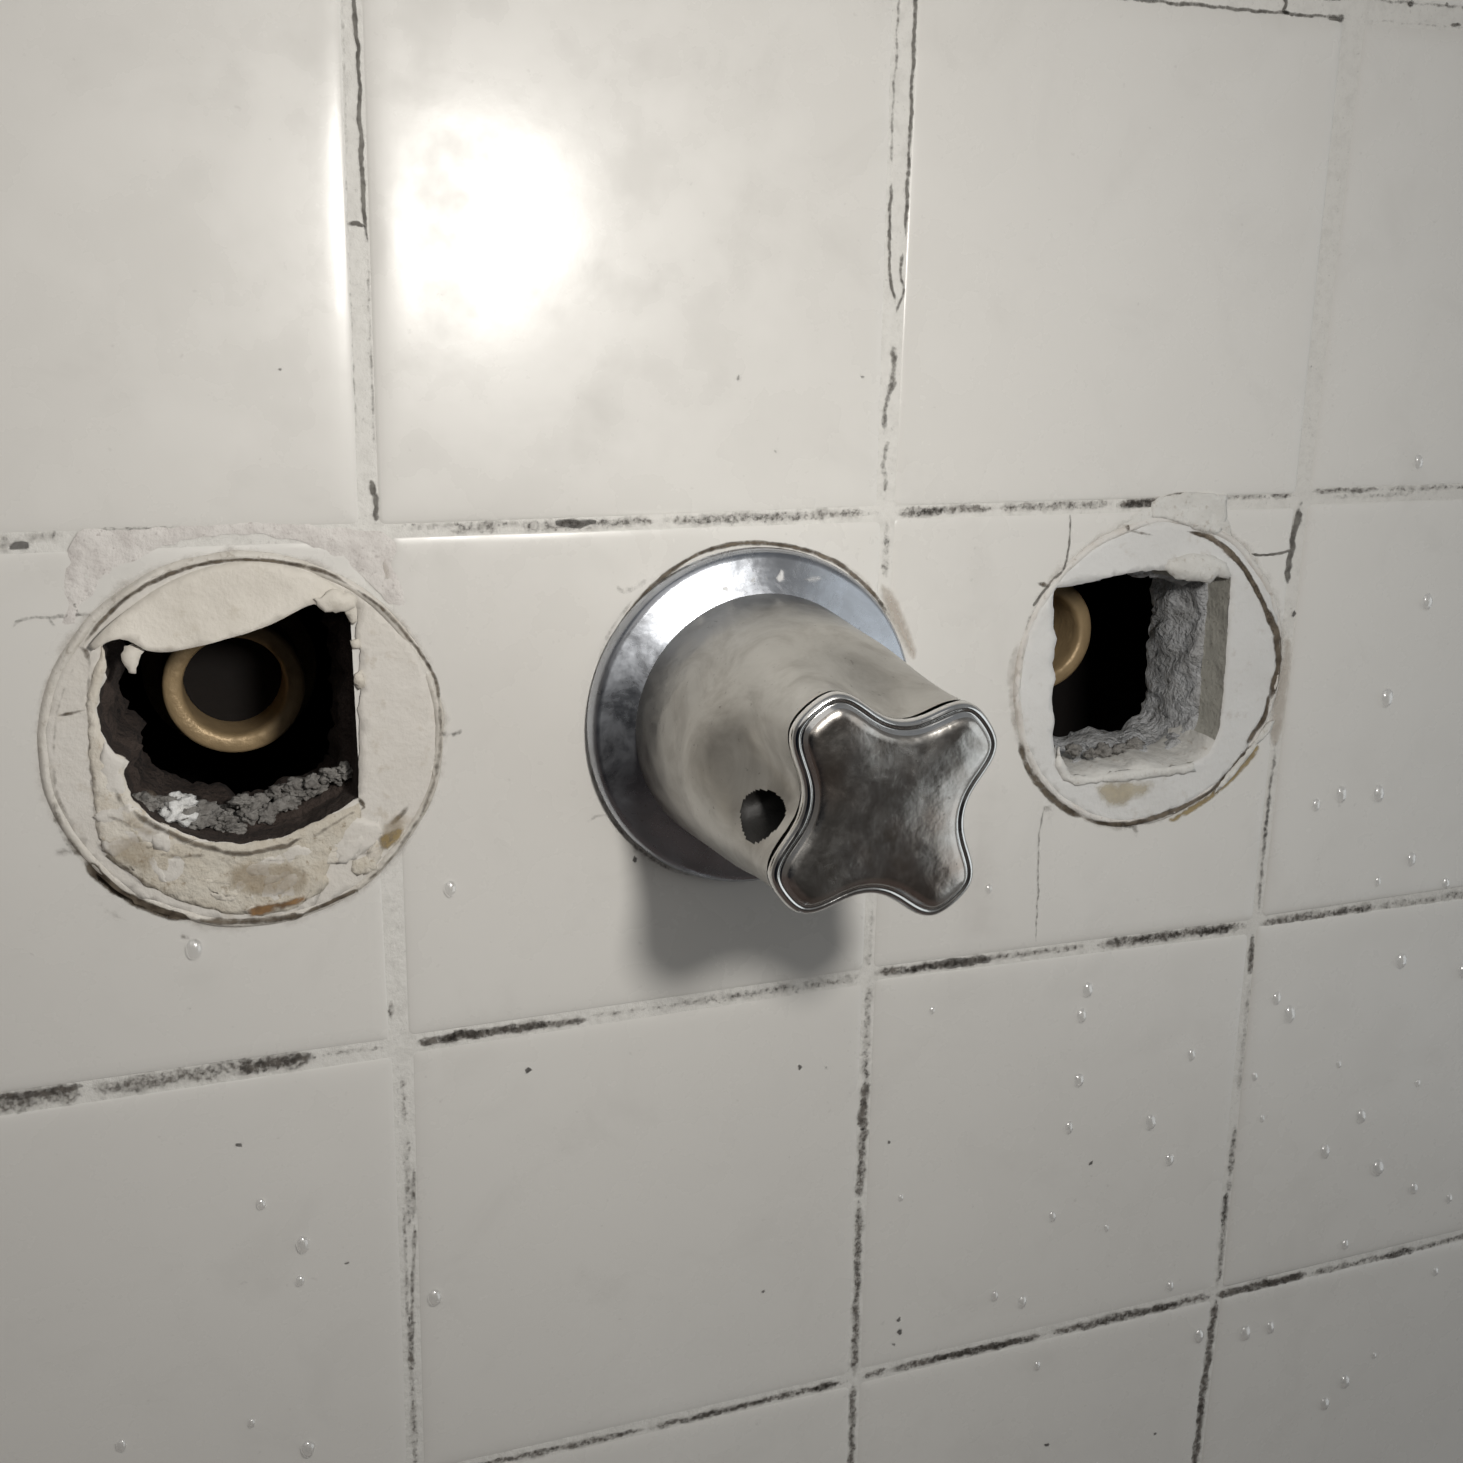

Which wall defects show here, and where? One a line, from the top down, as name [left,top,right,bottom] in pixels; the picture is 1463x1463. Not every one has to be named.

flaking render [45,561,435,920]
flaking render [1020,492,1296,820]
leakage [0,1084,77,1111]
leakage [109,1053,310,1091]